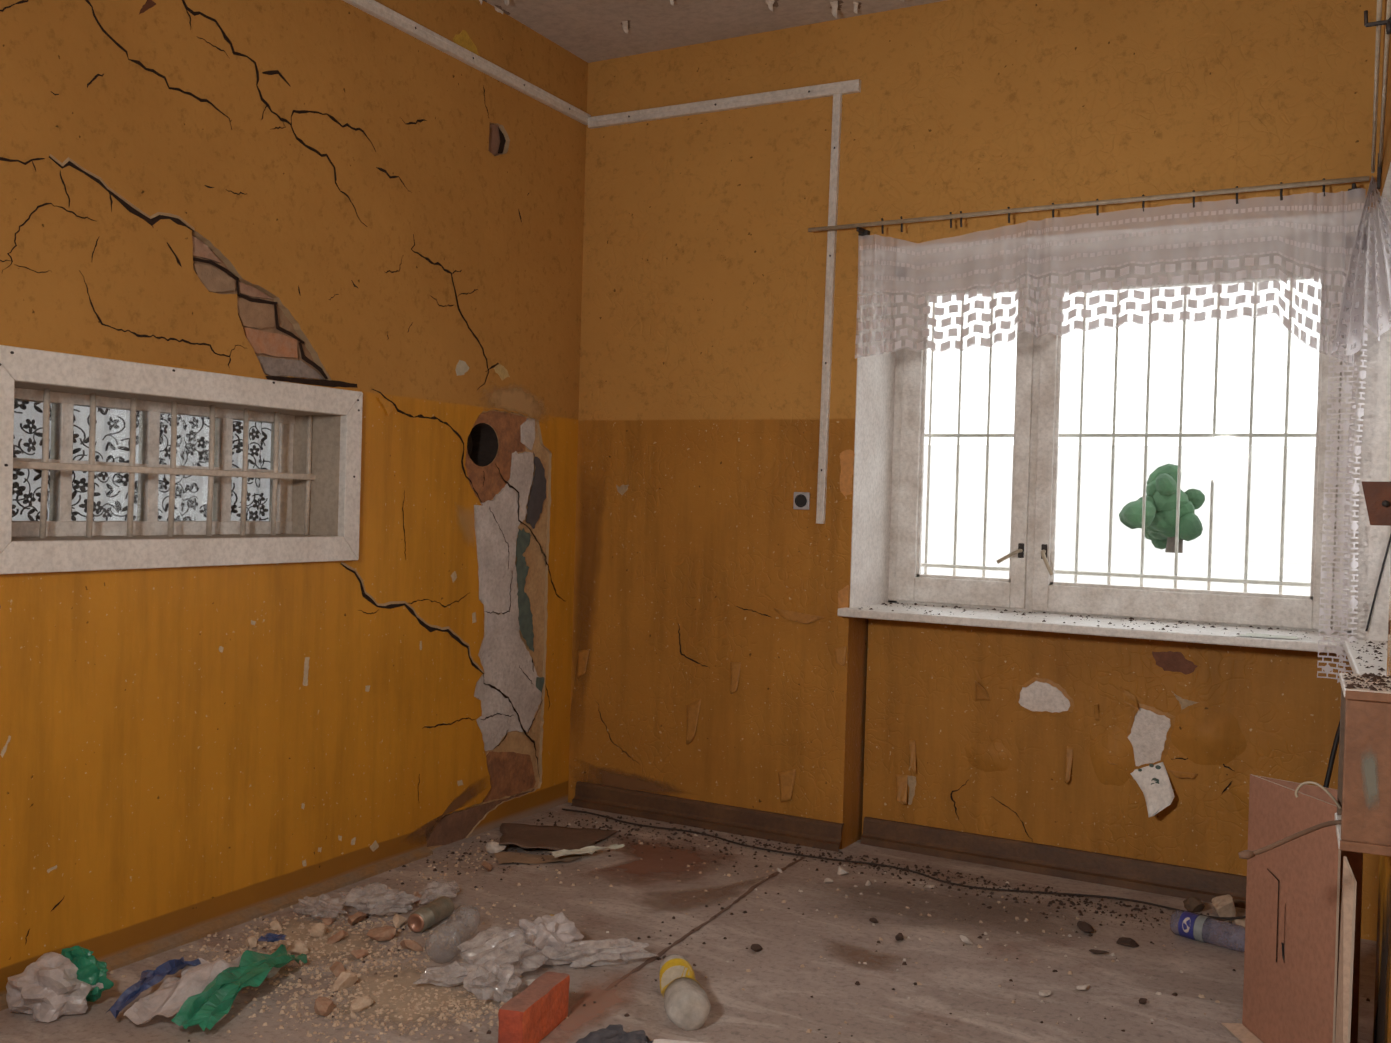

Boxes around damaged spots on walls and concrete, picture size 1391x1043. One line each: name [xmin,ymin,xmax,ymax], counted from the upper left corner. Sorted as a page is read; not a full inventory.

crack [0,0,29,12]
crack [52,0,408,227]
flaking render [488,122,510,156]
crack [0,154,244,368]
flaking render [192,231,358,388]
crack [298,234,499,390]
crack [372,389,482,503]
crack [341,561,485,675]
flaking render [426,409,552,850]
flaking render [1015,677,1075,717]
flaking render [1119,685,1200,769]
flaking render [1152,651,1198,675]